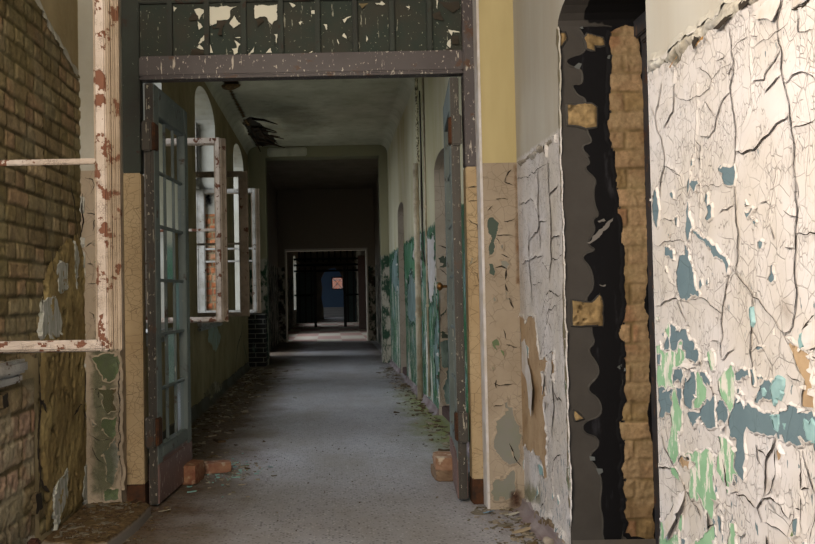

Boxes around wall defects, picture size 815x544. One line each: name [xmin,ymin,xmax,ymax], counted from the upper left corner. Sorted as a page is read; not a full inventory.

peeling [188,5,256,55]
peeling [253,3,278,54]
peeling [638,0,780,82]
peeling [37,237,96,340]
peeling [391,231,449,406]
crack [468,163,563,435]
peeling [489,22,644,544]
peeling [645,186,661,230]
peeling [664,154,732,303]
peeling [718,163,738,188]
crack [650,0,815,368]
peeling [644,262,815,544]